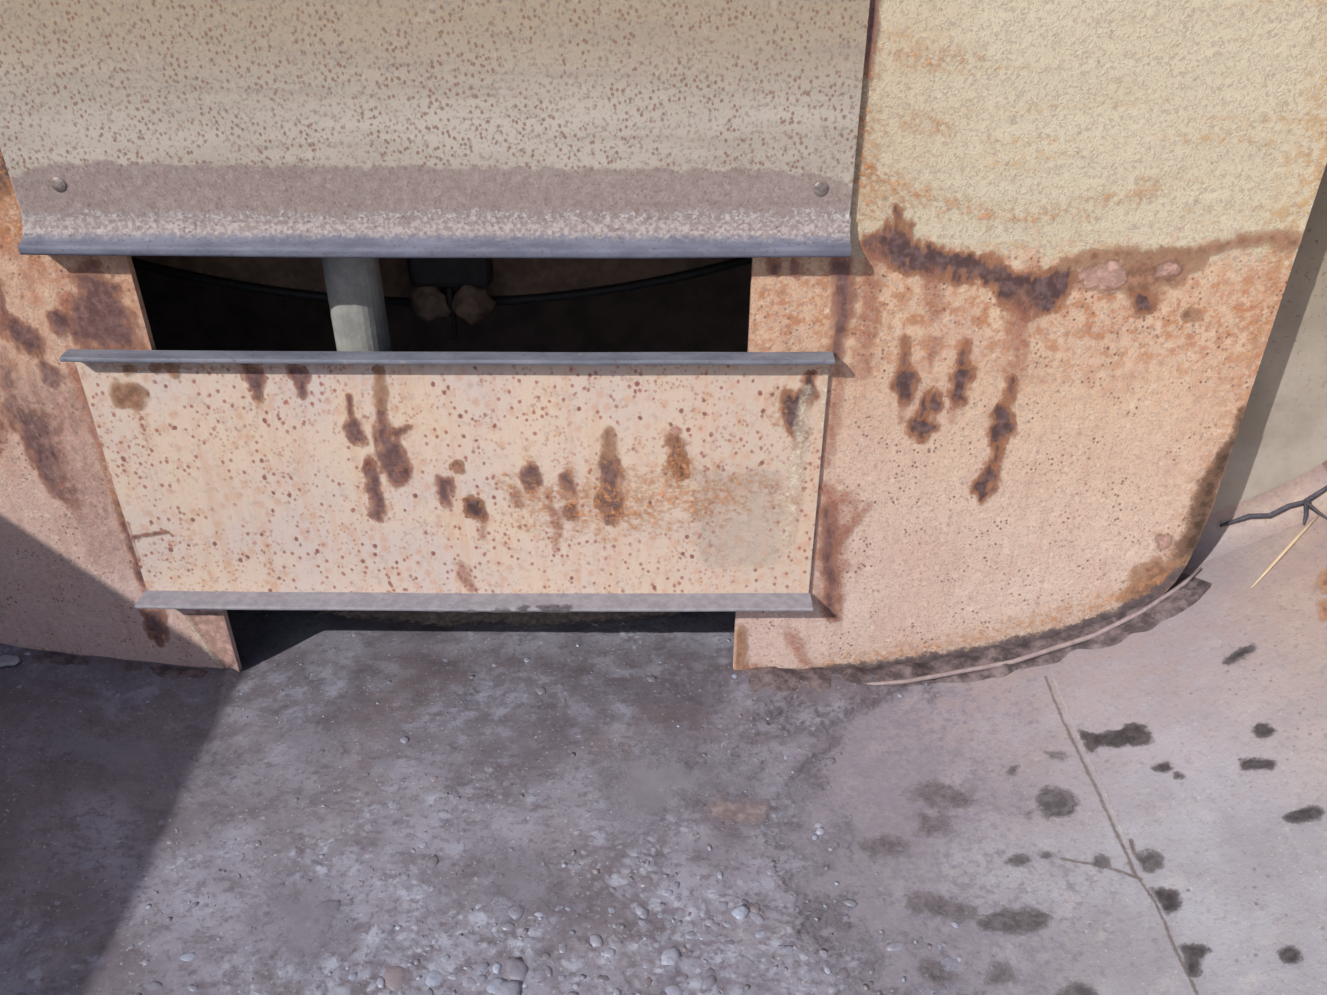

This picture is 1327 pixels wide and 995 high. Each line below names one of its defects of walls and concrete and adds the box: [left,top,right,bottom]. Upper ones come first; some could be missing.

rust [767,101,1302,505]
rust [0,260,206,592]
rust [343,365,412,522]
rust [435,459,488,538]
rust [497,426,766,545]
rust [996,406,1247,635]
damp [1079,722,1152,752]
damp [1028,785,1078,818]
crack [1044,676,1198,995]
damp [1135,849,1182,914]
damp [1283,806,1324,824]
damp [1179,944,1211,978]